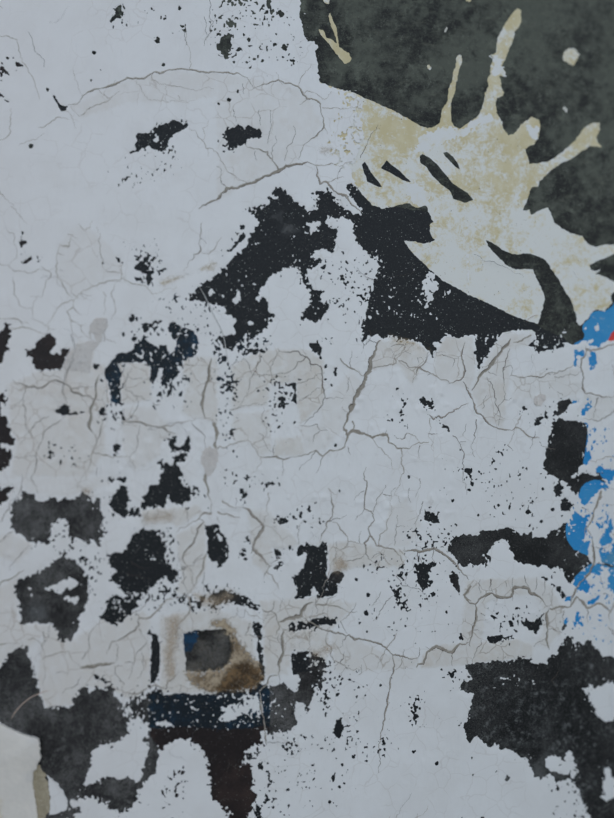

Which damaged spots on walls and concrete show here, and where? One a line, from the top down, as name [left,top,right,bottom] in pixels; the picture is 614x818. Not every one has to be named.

peeling [110,5,128,28]
peeling [118,119,188,188]
crack [0,0,373,268]
peeling [209,0,614,281]
peeling [0,322,12,363]
peeling [0,390,15,471]
peeling [0,433,399,818]
crack [0,193,614,773]
peeling [25,184,614,441]
peeling [363,387,614,636]
peeling [487,605,544,646]
peeling [440,621,614,818]